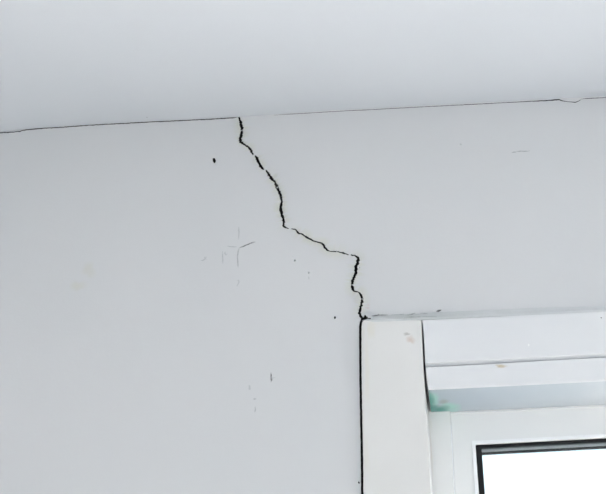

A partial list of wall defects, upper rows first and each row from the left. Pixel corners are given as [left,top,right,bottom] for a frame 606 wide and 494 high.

crack [0,117,606,494]